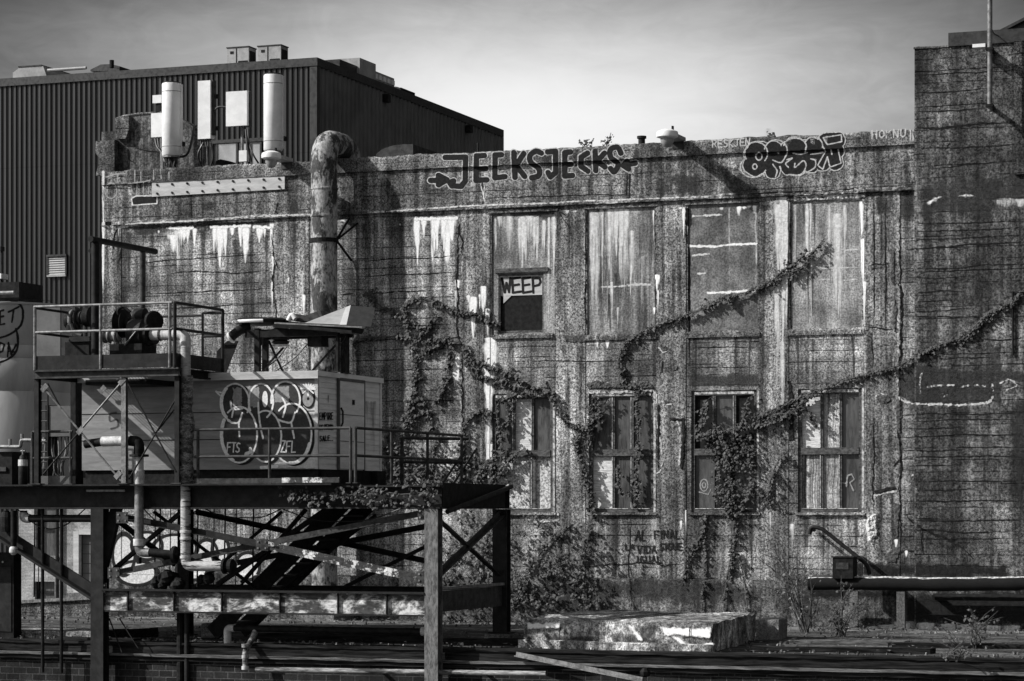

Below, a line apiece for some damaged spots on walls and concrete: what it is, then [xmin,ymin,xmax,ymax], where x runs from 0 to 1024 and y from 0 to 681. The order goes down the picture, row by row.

leakage [102,171,113,284]
leakage [118,202,274,276]
leakage [288,200,305,314]
leakage [399,214,458,266]
leakage [495,206,576,287]
leakage [588,179,644,319]
crack [340,185,1024,559]